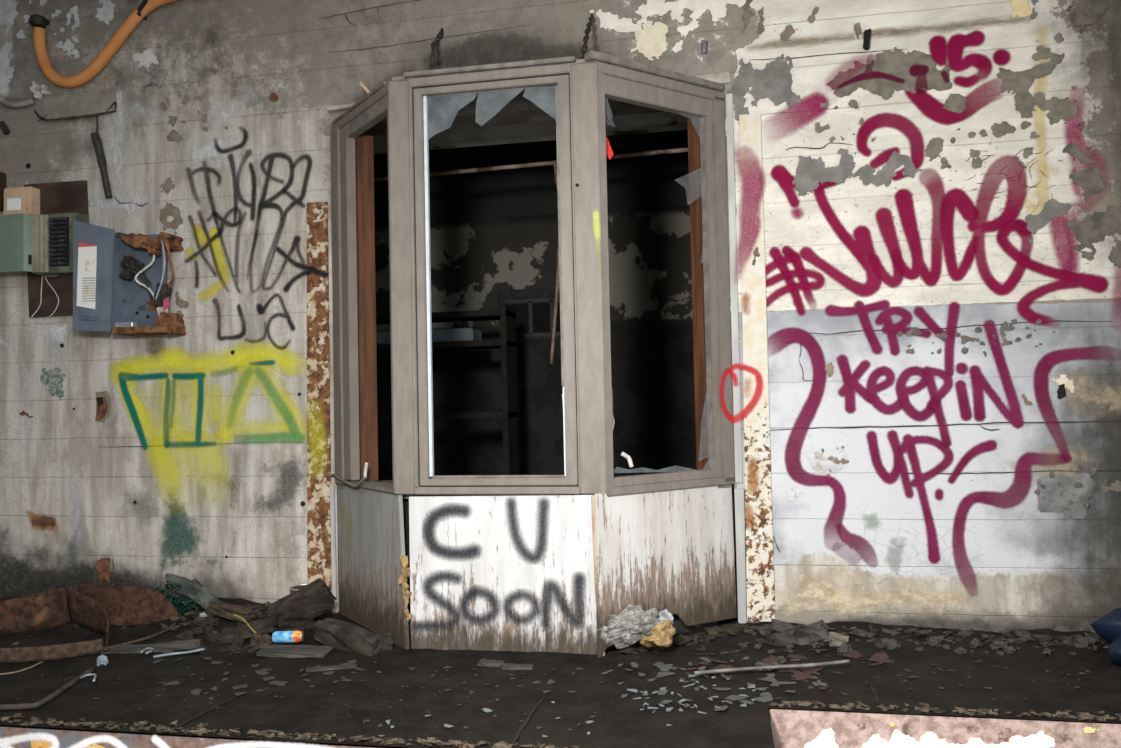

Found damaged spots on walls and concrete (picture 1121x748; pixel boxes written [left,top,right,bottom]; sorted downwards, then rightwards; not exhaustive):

peeling [0,0,81,94]
peeling [95,0,115,25]
peeling [134,48,159,71]
peeling [588,0,765,61]
peeling [727,25,802,124]
peeling [792,32,1078,196]
peeling [1025,143,1121,268]
corrosion [28,512,56,529]
water stain [0,532,170,599]
water stain [161,504,200,568]
corrosion [749,459,758,492]
spalling [1035,461,1121,519]